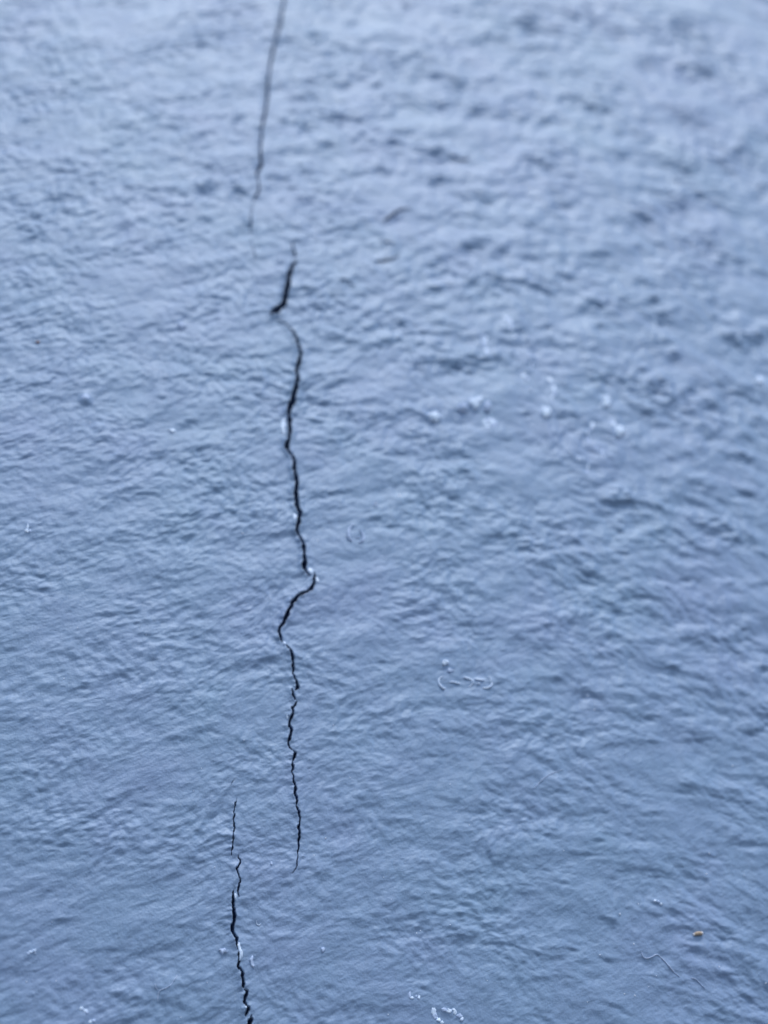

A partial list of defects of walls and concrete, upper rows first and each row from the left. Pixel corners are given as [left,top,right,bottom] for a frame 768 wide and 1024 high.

crack [250,0,285,257]
crack [270,244,319,870]
crack [230,780,252,1024]